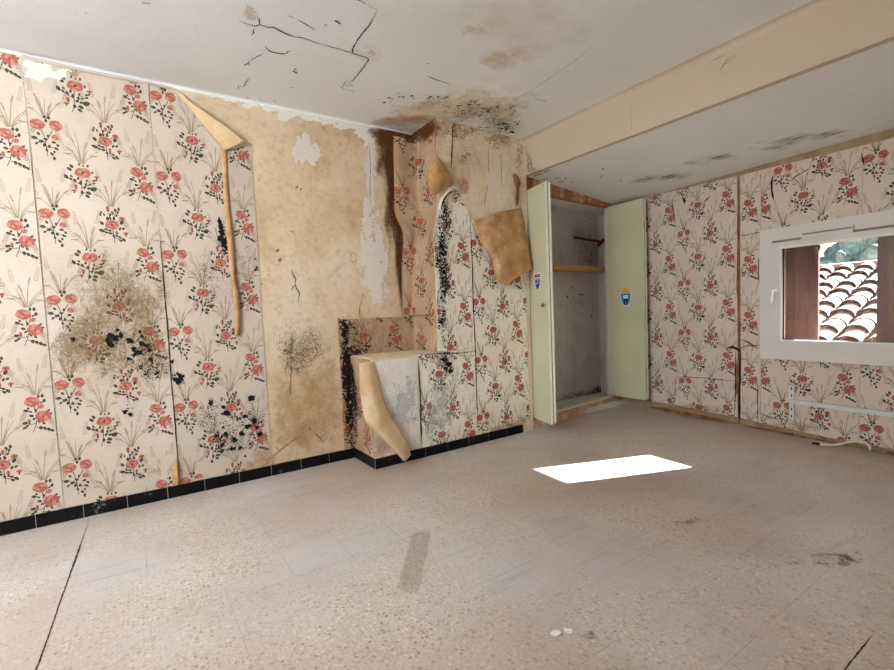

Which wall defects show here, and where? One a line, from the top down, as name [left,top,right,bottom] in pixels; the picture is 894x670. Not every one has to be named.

crack [238,0,377,92]
water stain [383,94,525,172]
water stain [54,268,185,385]
water stain [189,395,265,463]
water stain [267,317,373,448]
flaking render [374,357,421,452]
crack [35,525,88,670]
crack [844,635,872,670]